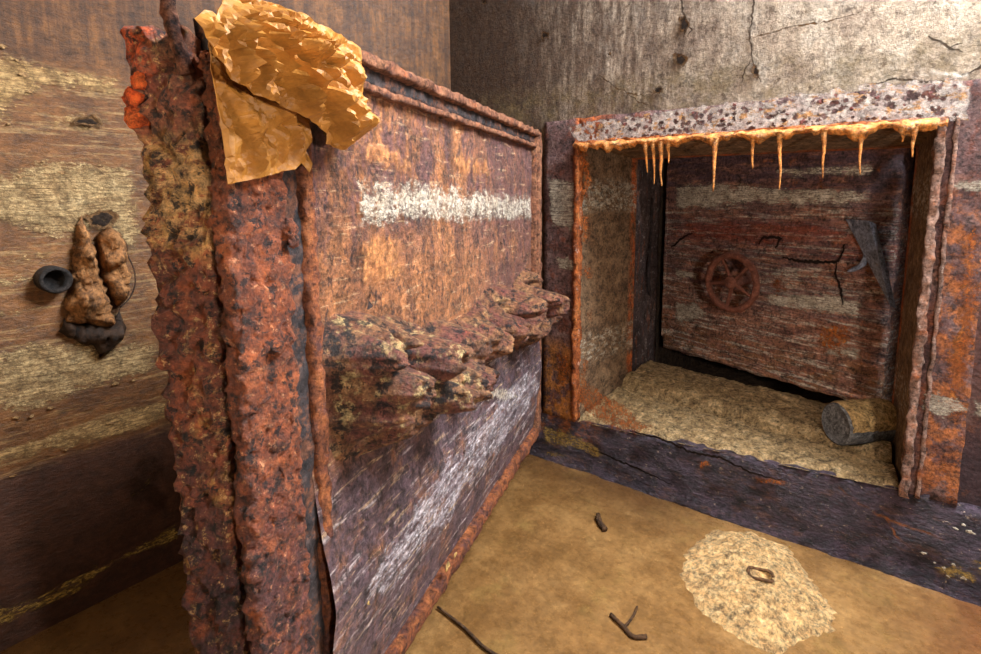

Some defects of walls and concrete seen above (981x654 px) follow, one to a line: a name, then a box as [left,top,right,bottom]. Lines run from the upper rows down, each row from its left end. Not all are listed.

crack [742,0,857,82]
corrosion [573,117,949,200]
water stain [357,181,531,226]
corrosion [362,236,400,279]
crack [758,235,845,305]
corrosion [947,228,981,415]